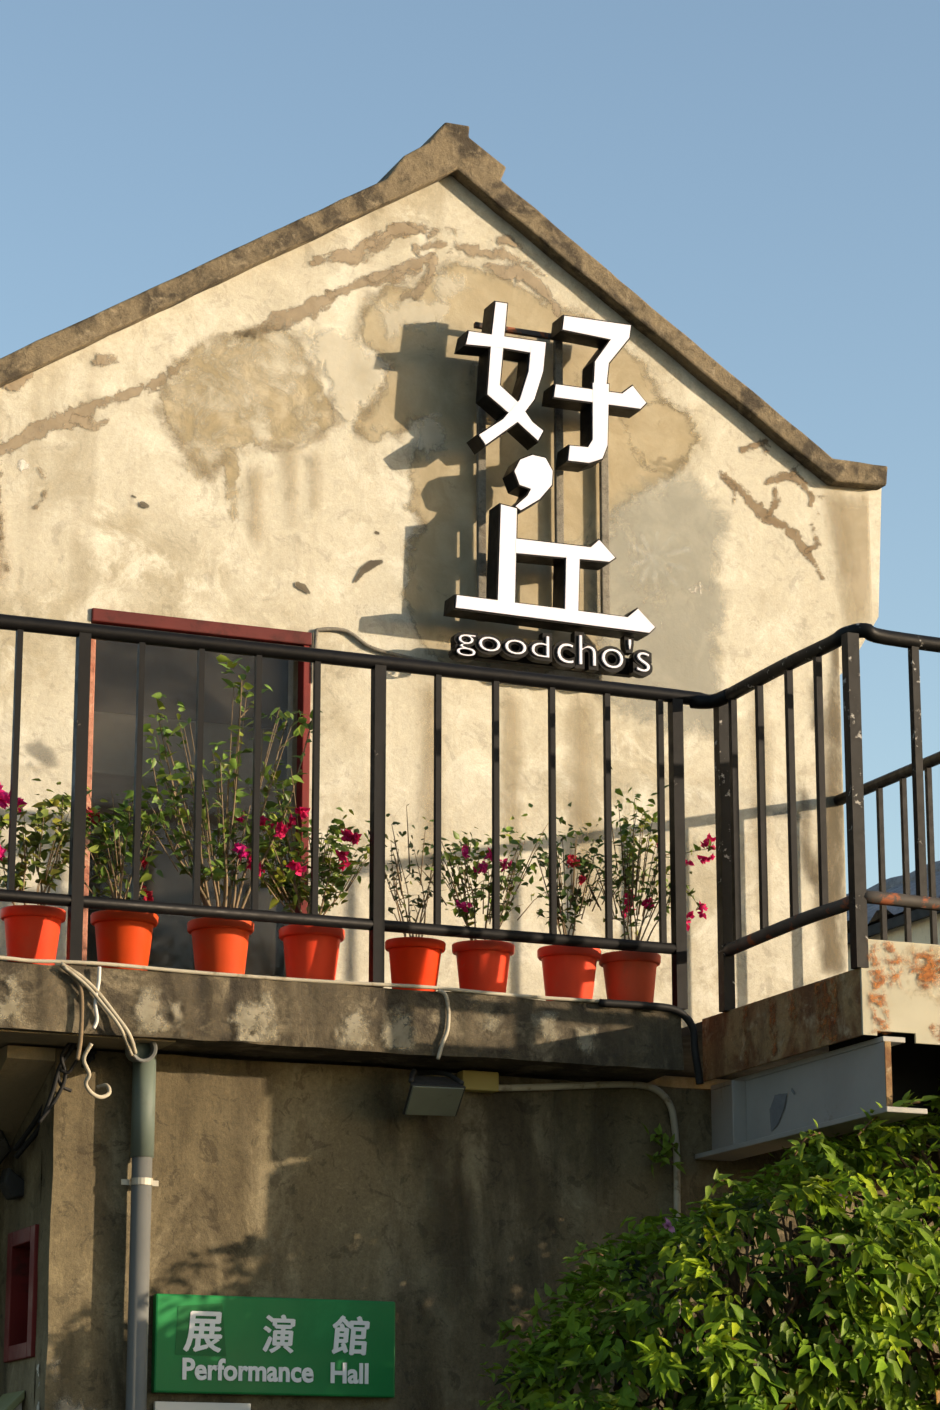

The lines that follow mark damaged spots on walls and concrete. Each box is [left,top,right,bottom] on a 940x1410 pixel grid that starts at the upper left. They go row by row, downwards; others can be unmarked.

peeling [162,262,699,674]
rust [814,976,839,1044]
rust [868,942,940,1034]